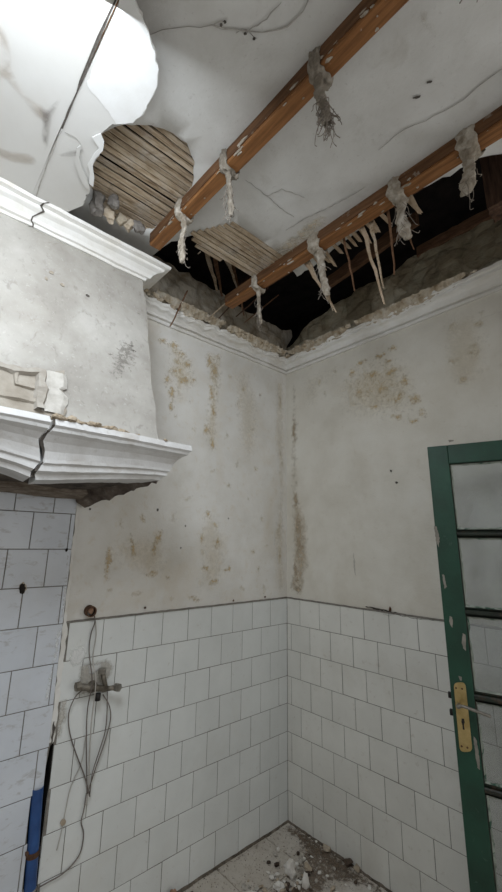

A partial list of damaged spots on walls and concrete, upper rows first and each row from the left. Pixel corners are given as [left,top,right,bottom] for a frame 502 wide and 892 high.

peeling [87,0,159,124]
crack [29,0,117,227]
peeling [75,133,104,190]
spalling [144,270,477,359]
spalling [0,361,68,417]
crack [31,418,55,477]